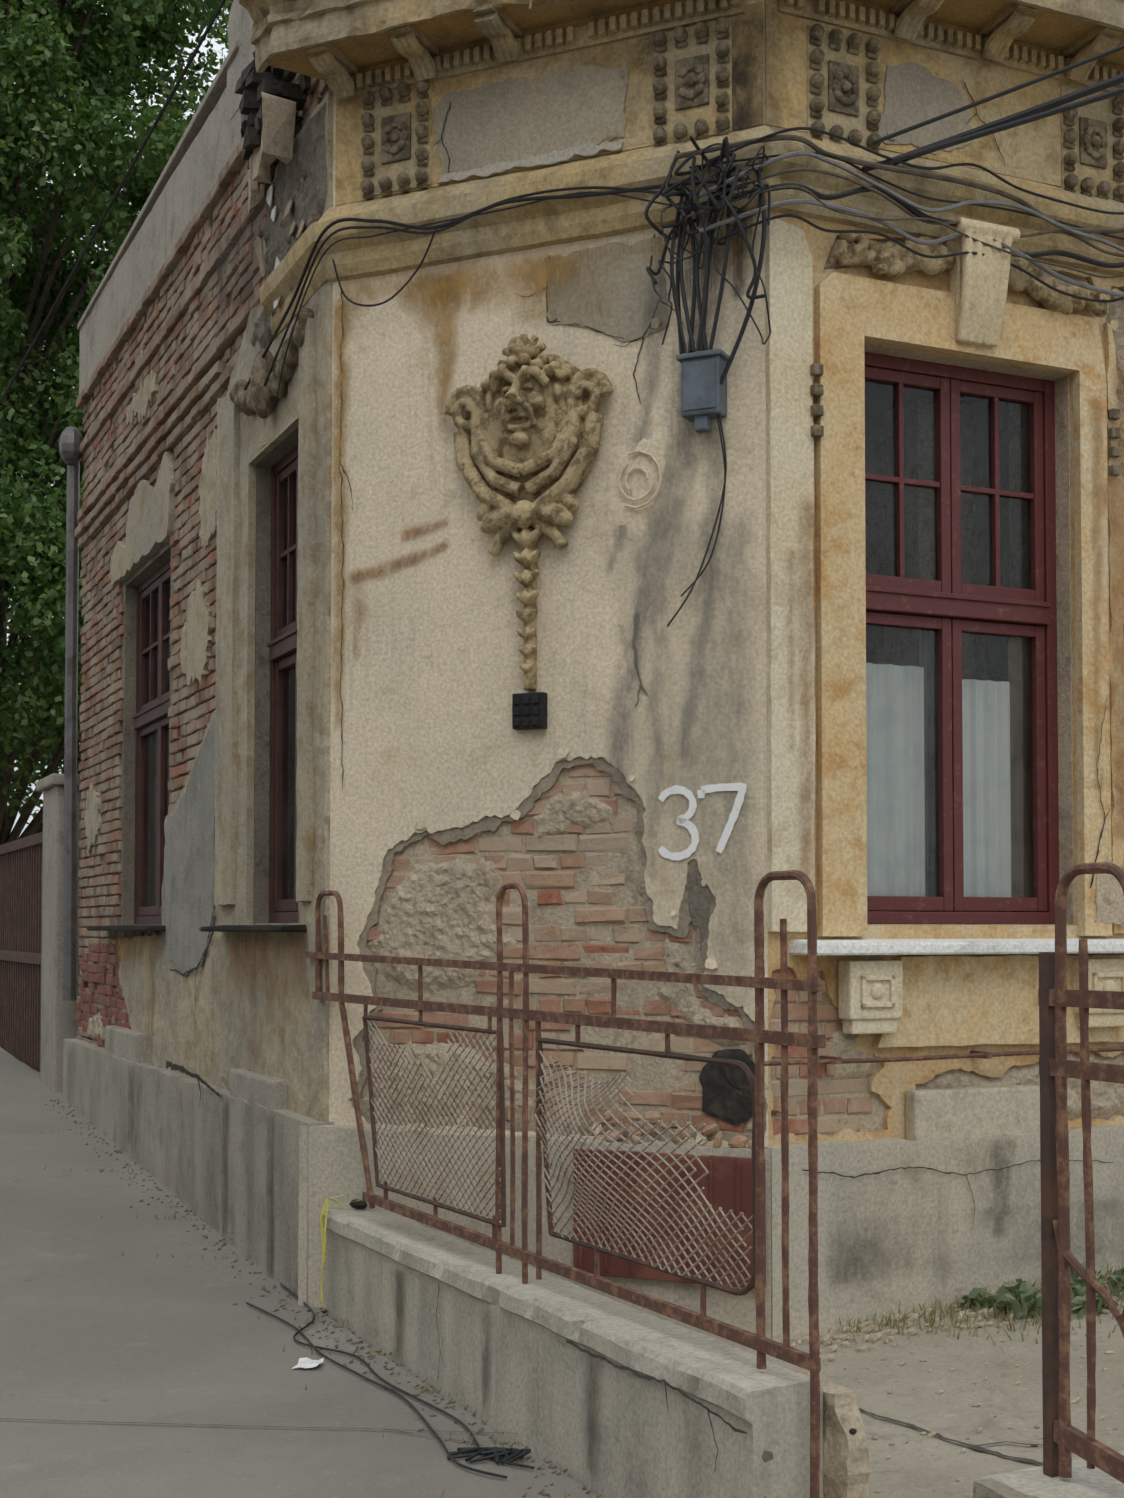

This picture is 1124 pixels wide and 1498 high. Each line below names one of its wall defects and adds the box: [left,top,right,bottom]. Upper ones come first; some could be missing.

flaking render [254,102,328,277]
flaking render [823,237,856,270]
flaking render [250,294,281,349]
flaking render [1106,288,1124,482]
flaking render [1094,856,1124,926]
spalling [75,943,131,1047]
flaking render [349,747,877,1149]
flaking render [915,1061,1040,1090]
flaking render [1067,1043,1124,1121]
crack [566,1339,748,1473]